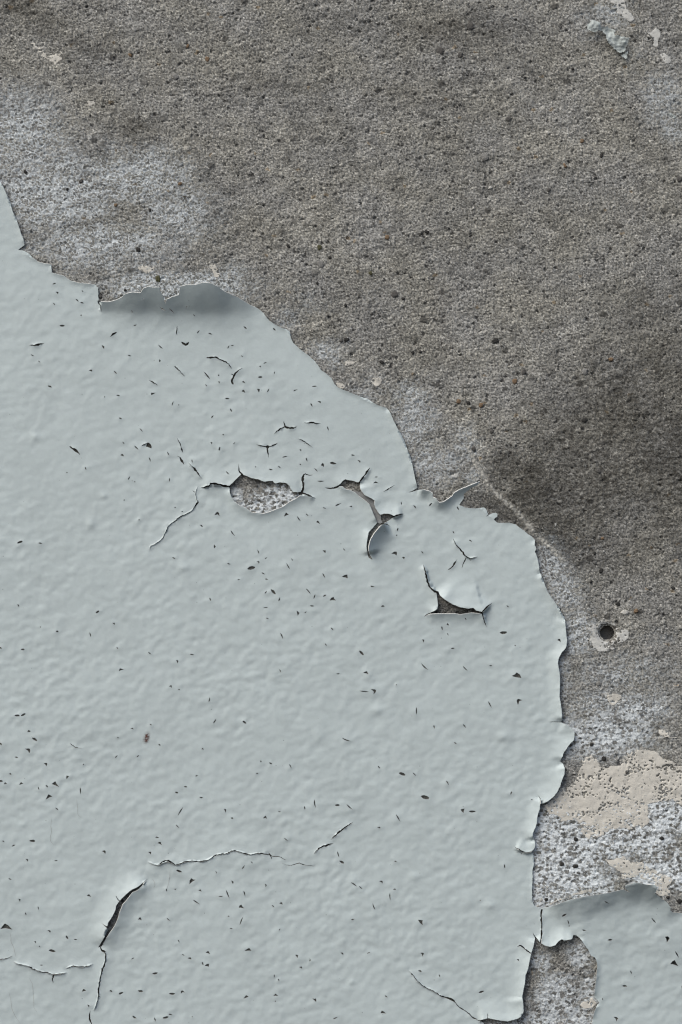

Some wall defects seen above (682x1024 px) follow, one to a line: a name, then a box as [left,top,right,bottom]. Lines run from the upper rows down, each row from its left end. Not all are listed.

peeling [0,181,94,288]
peeling [100,282,264,315]
crack [141,438,206,552]
peeling [201,462,316,522]
peeling [327,466,403,559]
peeling [418,472,480,511]
peeling [418,564,492,626]
peeling [516,541,575,853]
crack [144,820,353,888]
peeling [90,873,152,947]
peeling [478,927,599,1024]